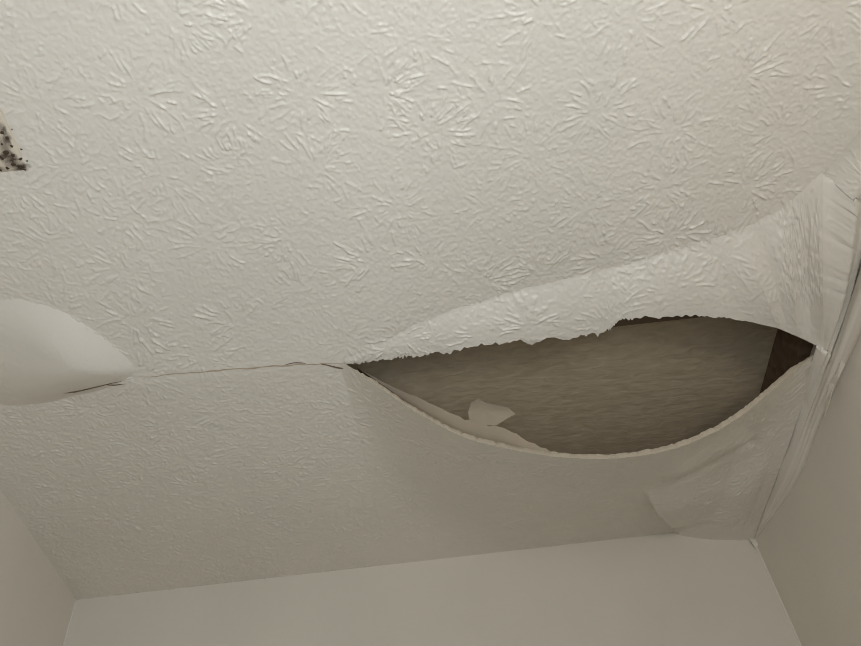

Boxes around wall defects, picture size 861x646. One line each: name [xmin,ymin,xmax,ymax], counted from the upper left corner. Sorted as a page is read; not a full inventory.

water stain [0,128,28,171]
peeling [750,131,861,548]
crack [68,381,122,393]
crack [153,362,345,377]